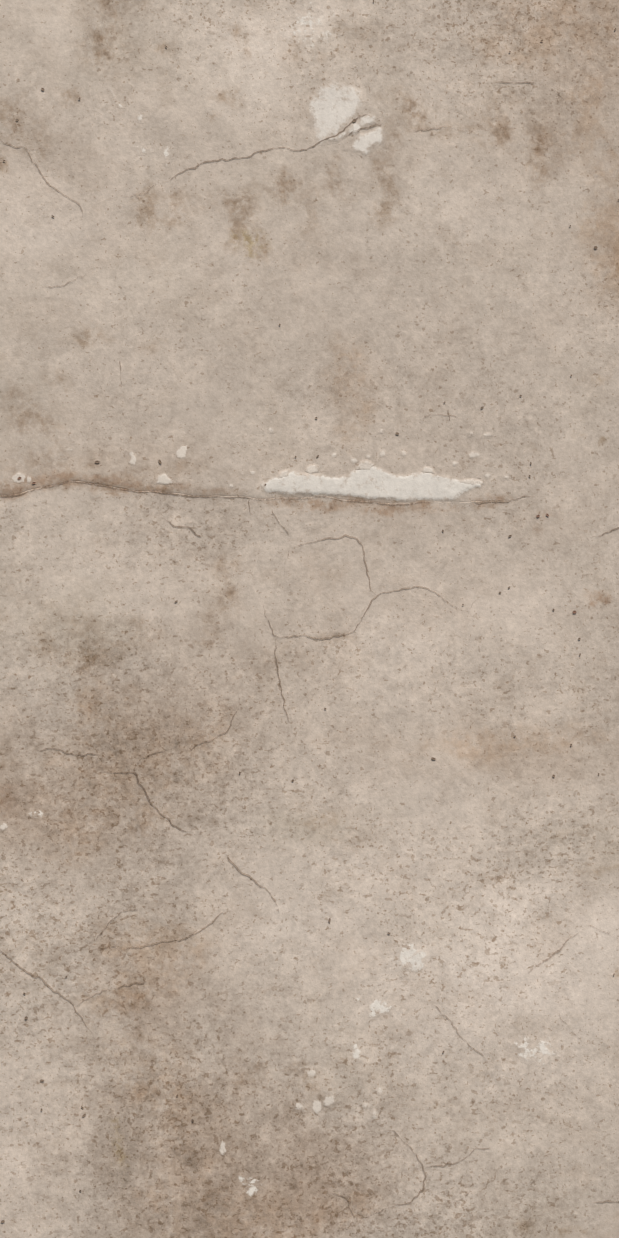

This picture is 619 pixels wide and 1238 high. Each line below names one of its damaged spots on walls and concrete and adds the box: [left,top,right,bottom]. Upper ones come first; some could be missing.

crack [2,141,82,210]
crack [177,115,376,175]
flaking render [305,77,387,158]
flaking render [260,430,511,505]
crack [474,496,530,504]
crack [1,481,453,714]
crack [41,711,237,831]
crack [227,856,275,901]
crack [100,909,221,949]
crack [2,952,144,1027]